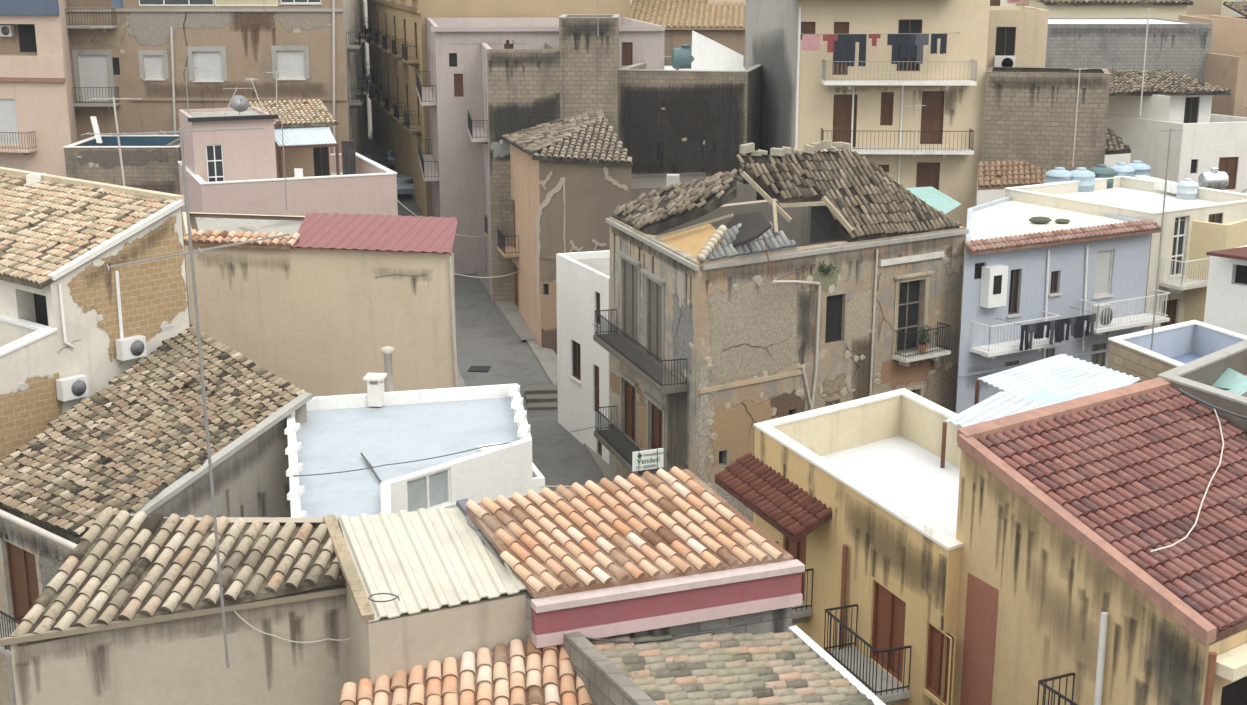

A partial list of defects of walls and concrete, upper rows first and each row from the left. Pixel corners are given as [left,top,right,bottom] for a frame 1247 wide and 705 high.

flaking render [0,373,63,461]
flaking render [68,216,188,361]
crack [723,338,788,359]
flaking render [672,264,841,523]
flaking render [819,288,877,399]
flaking render [873,359,957,413]